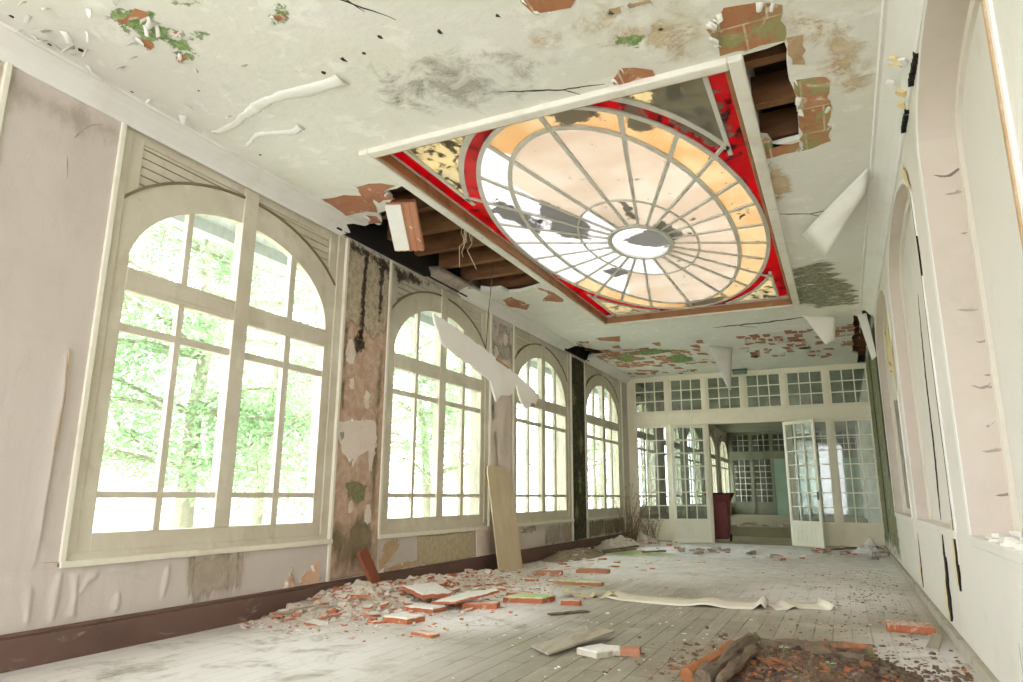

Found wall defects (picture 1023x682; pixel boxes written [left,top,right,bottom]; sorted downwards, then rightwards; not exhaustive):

peeling [8,1,105,83]
peeling [115,9,161,71]
spalling [706,1,806,65]
damp [410,66,481,99]
spalling [762,77,832,159]
spalling [321,184,394,225]
peeling [802,169,867,256]
damp [785,262,859,308]
spalling [575,315,855,390]
crack [903,168,962,622]
flaking render [280,313,417,589]